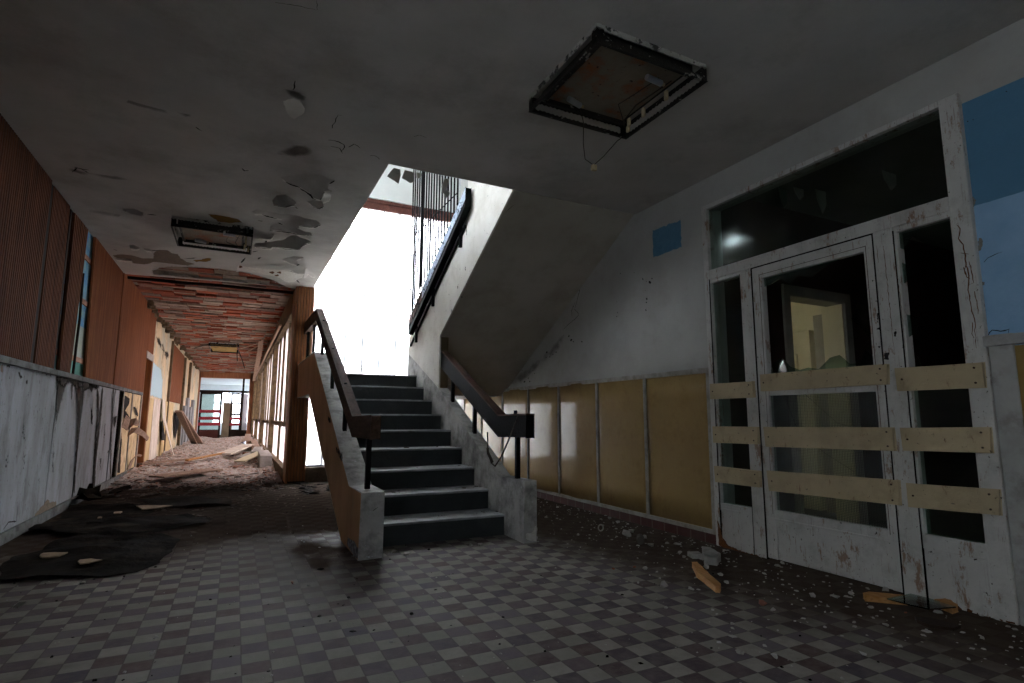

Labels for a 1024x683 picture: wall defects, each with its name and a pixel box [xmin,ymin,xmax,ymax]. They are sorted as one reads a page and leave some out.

peeling [152,174,334,288]